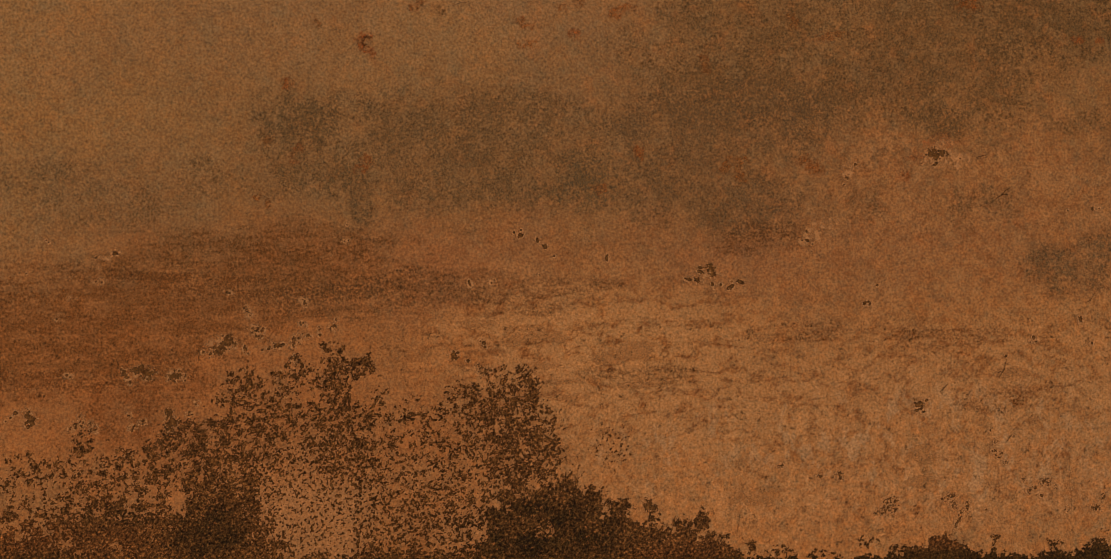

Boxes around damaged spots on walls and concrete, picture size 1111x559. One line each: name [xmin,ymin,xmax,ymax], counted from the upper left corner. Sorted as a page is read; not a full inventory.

spalling [920,140,971,170]
spalling [682,263,746,292]
rust [0,227,507,444]